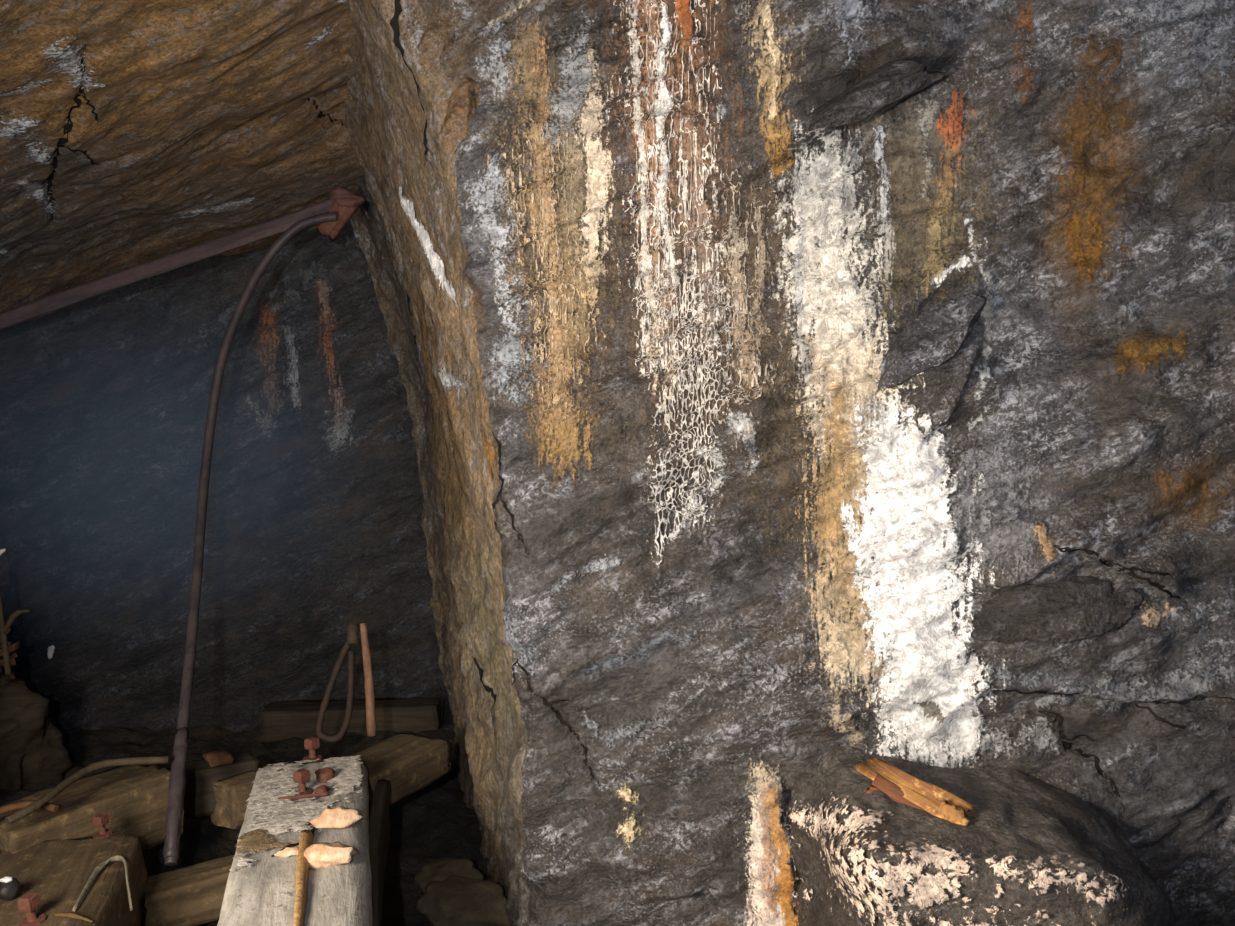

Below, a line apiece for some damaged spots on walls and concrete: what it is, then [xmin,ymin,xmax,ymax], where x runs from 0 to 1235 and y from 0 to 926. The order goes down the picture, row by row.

crack [46,44,101,225]
crack [390,0,427,161]
corrosion [675,0,693,48]
corrosion [847,57,1002,342]
corrosion [1007,1,1035,104]
corrosion [1039,18,1144,289]
damp [399,187,477,560]
damp [462,0,1235,768]
crack [1053,545,1187,603]
crack [972,685,1235,812]